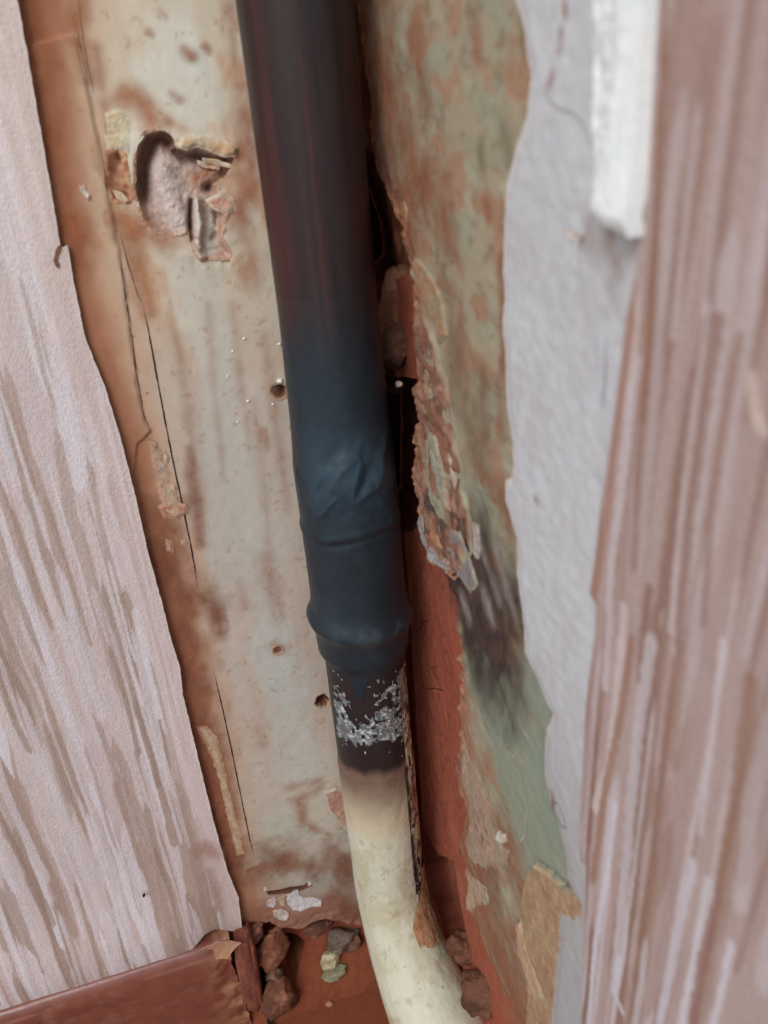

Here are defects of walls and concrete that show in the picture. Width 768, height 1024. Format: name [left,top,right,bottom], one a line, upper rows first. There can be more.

rust [20,0,48,76]
rust [43,124,57,158]
rust [119,90,154,124]
flaking render [104,109,239,263]
crack [121,237,198,586]
flaking render [387,256,483,594]
rust [154,512,211,728]
water stain [479,540,510,624]
peeling [194,725,245,856]
crack [214,674,254,855]
rust [204,756,351,879]
peeling [515,859,582,1024]